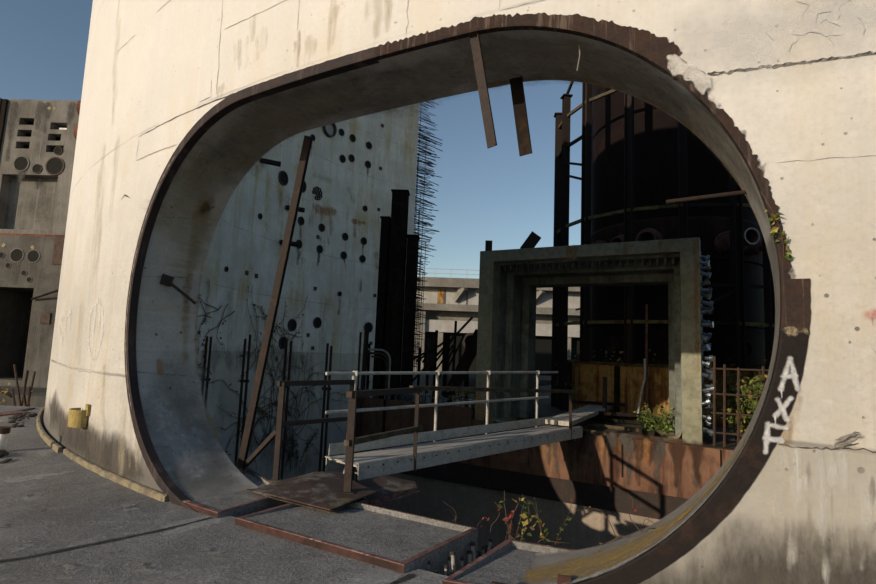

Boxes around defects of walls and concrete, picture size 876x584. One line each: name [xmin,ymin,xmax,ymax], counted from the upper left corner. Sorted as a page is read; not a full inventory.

crack [678,0,876,76]
peeling [667,55,719,106]
crack [777,155,876,163]
water stain [50,398,139,478]
rust [546,431,703,488]
crack [780,443,876,453]